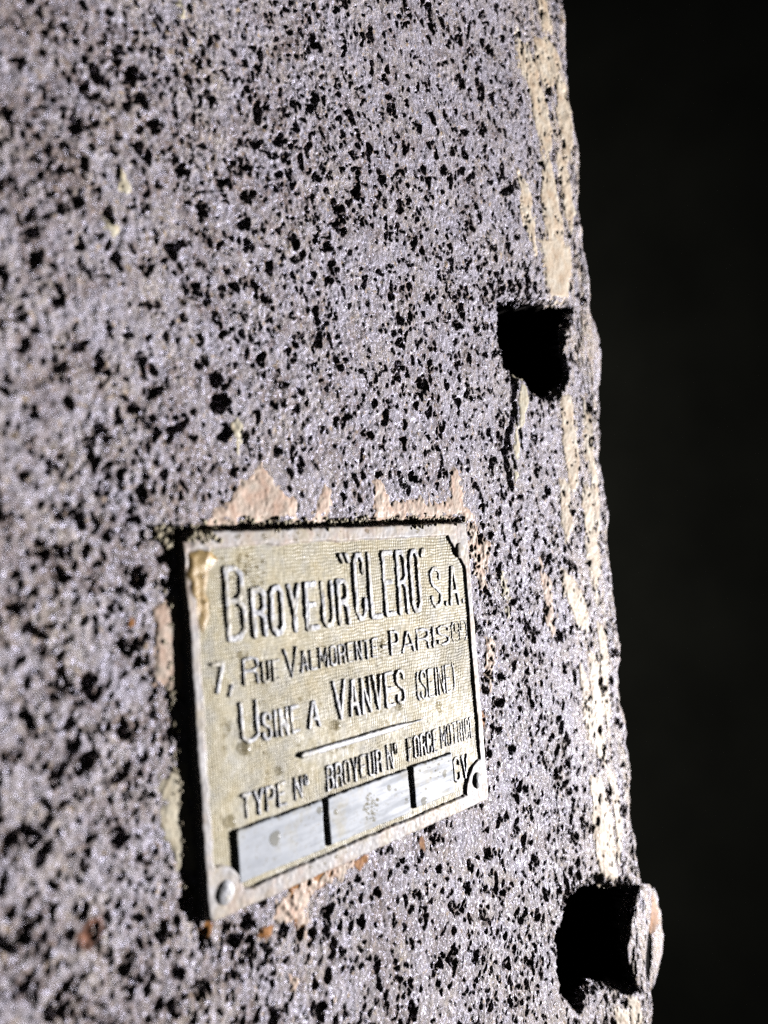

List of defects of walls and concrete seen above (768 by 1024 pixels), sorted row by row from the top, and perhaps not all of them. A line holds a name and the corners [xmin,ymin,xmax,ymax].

peeling [511,0,576,307]
peeling [199,461,332,530]
peeling [537,388,623,888]
peeling [262,859,355,944]